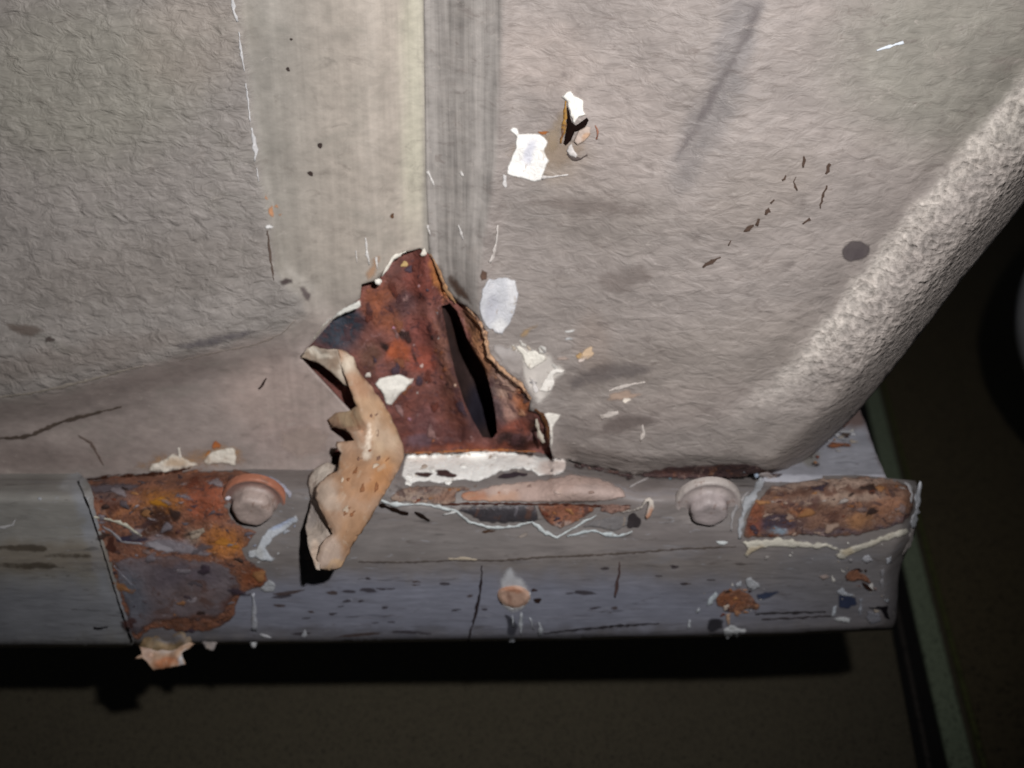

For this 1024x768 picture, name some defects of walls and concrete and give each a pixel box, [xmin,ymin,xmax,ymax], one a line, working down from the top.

crack [231,0,259,182]
peeling [503,128,568,188]
damp [843,241,869,261]
rust [429,254,532,400]
crack [0,406,122,466]
peeling [150,441,239,472]
peeling [283,301,654,571]
rust [77,467,298,648]
rust [574,464,922,624]
crack [467,565,483,642]
rust [688,577,777,639]
peeling [134,631,218,671]